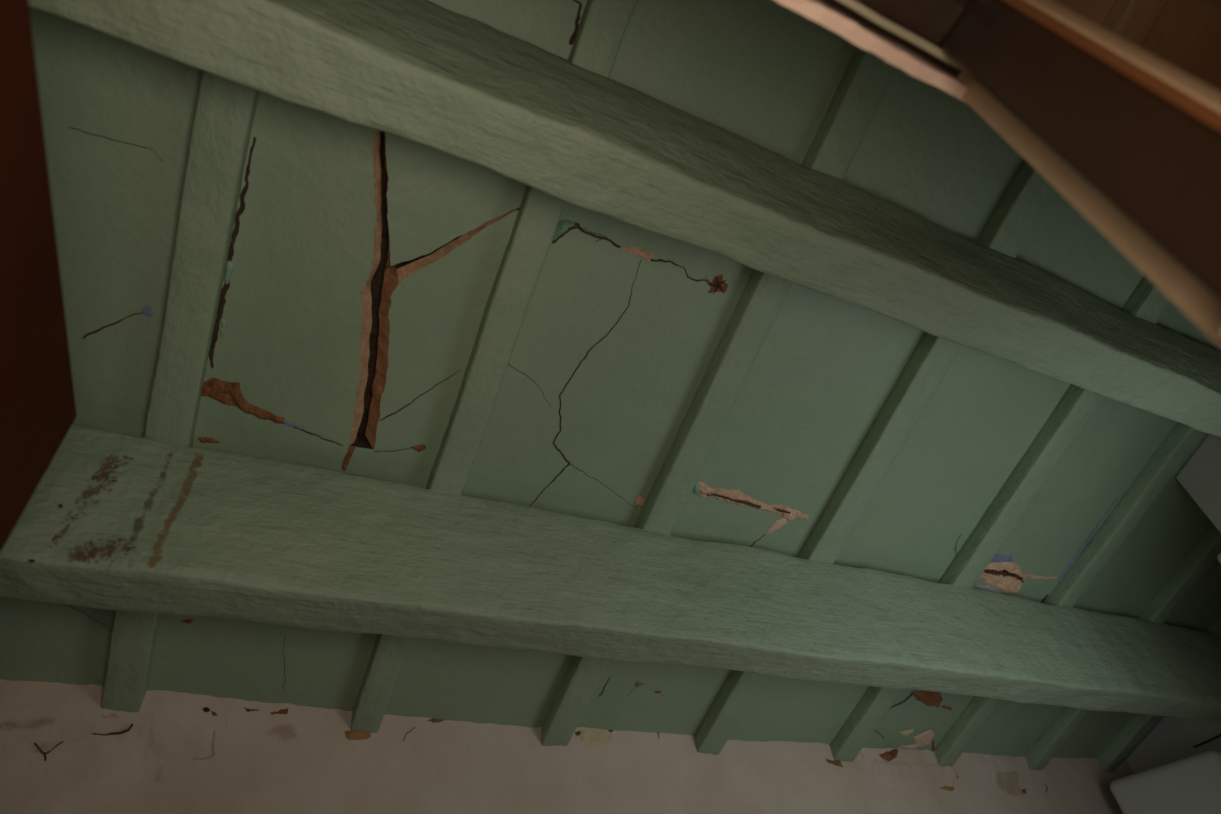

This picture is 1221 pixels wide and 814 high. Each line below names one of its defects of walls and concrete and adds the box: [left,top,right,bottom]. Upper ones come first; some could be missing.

spalling [569,0,582,45]
crack [209,137,256,369]
crack [341,131,520,471]
crack [508,219,729,508]
spalling [201,378,342,446]
spalling [692,479,809,547]
spalling [975,554,1058,594]
spalling [890,691,952,710]
peeling [825,729,935,768]